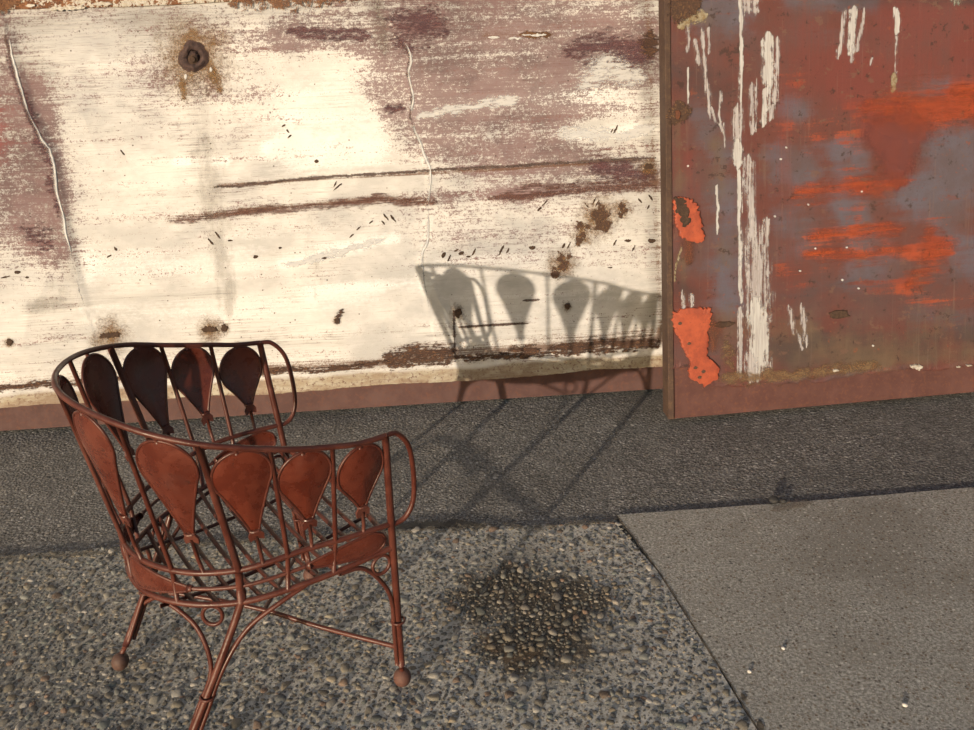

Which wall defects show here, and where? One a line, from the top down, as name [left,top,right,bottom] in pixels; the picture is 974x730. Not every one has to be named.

corrosion [226,0,358,13]
peeling [741,0,759,14]
corrosion [160,19,226,100]
peeling [586,155,656,184]
corrosion [488,162,656,280]
peeling [672,196,705,263]
peeling [671,306,735,387]
damp [448,561,612,680]